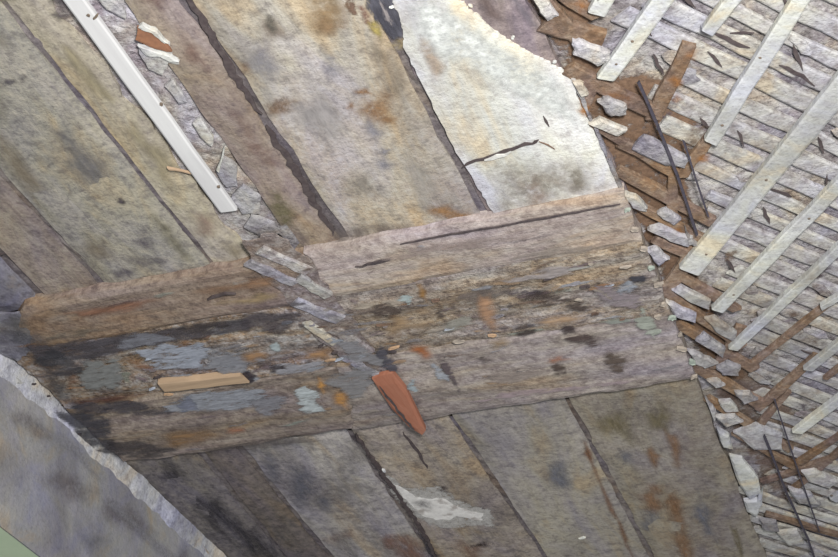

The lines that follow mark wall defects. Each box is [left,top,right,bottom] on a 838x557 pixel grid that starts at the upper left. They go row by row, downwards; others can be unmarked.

peeling [135,22,179,63]
crack [462,116,555,168]
crack [355,203,620,268]
damp [456,288,594,313]
damp [13,313,300,392]
peeling [69,295,452,418]
damp [560,326,601,347]
damp [604,352,626,373]
spalling [0,354,226,557]
damp [57,400,176,458]
spalling [705,395,763,516]
flaking render [382,468,494,528]